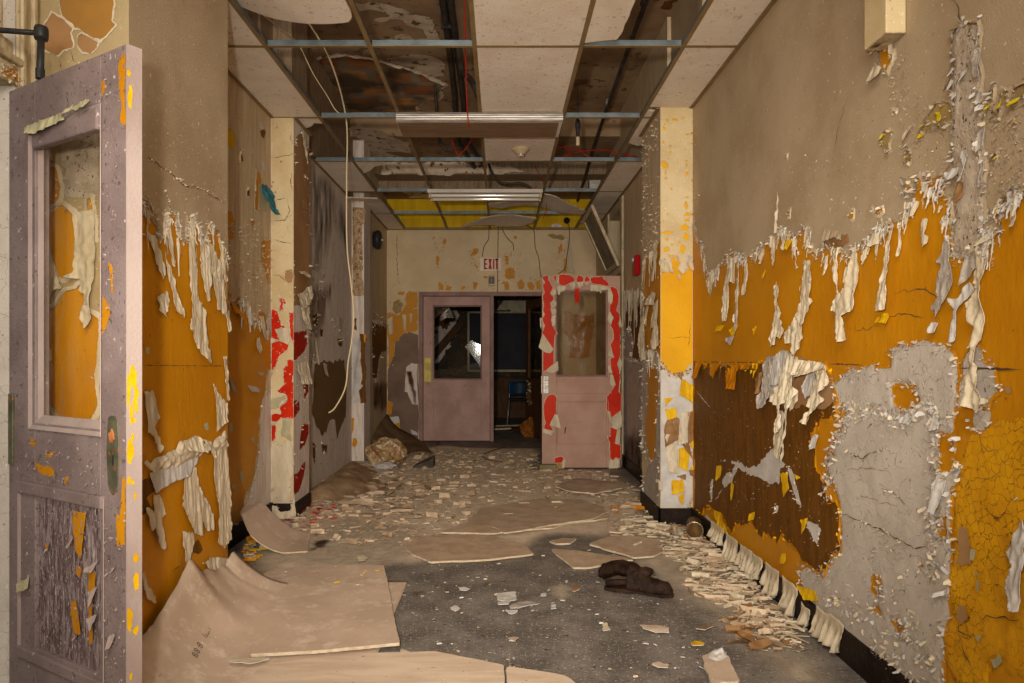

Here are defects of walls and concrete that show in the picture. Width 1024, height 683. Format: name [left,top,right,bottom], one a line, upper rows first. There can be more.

peeling [43,0,117,57]
spalling [317,53,448,112]
crack [147,158,224,214]
flaking render [438,14,1024,683]
peeling [16,120,419,681]
crack [952,612,1017,680]